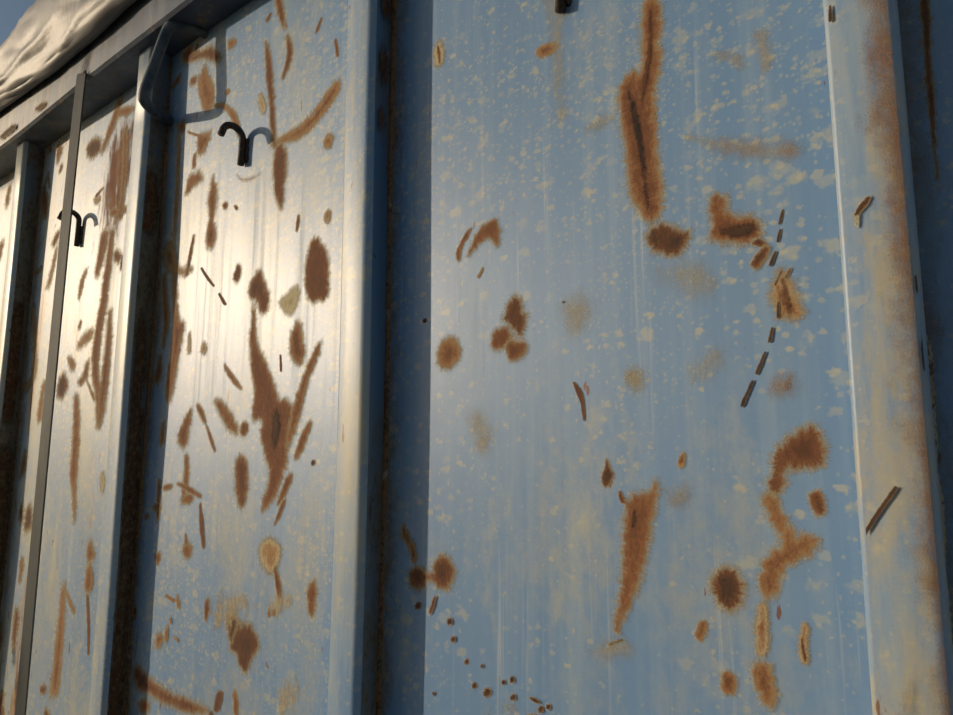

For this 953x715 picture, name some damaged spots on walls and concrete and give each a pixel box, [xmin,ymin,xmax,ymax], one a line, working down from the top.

corrosion [617,0,691,258]
corrosion [2,301,45,424]
corrosion [56,96,135,522]
corrosion [109,120,237,715]
corrosion [215,237,330,618]
corrosion [456,218,500,261]
corrosion [708,193,770,270]
corrosion [40,584,75,715]
corrosion [204,597,259,673]
corrosion [601,459,661,633]
corrosion [709,566,746,615]
corrosion [751,423,828,708]